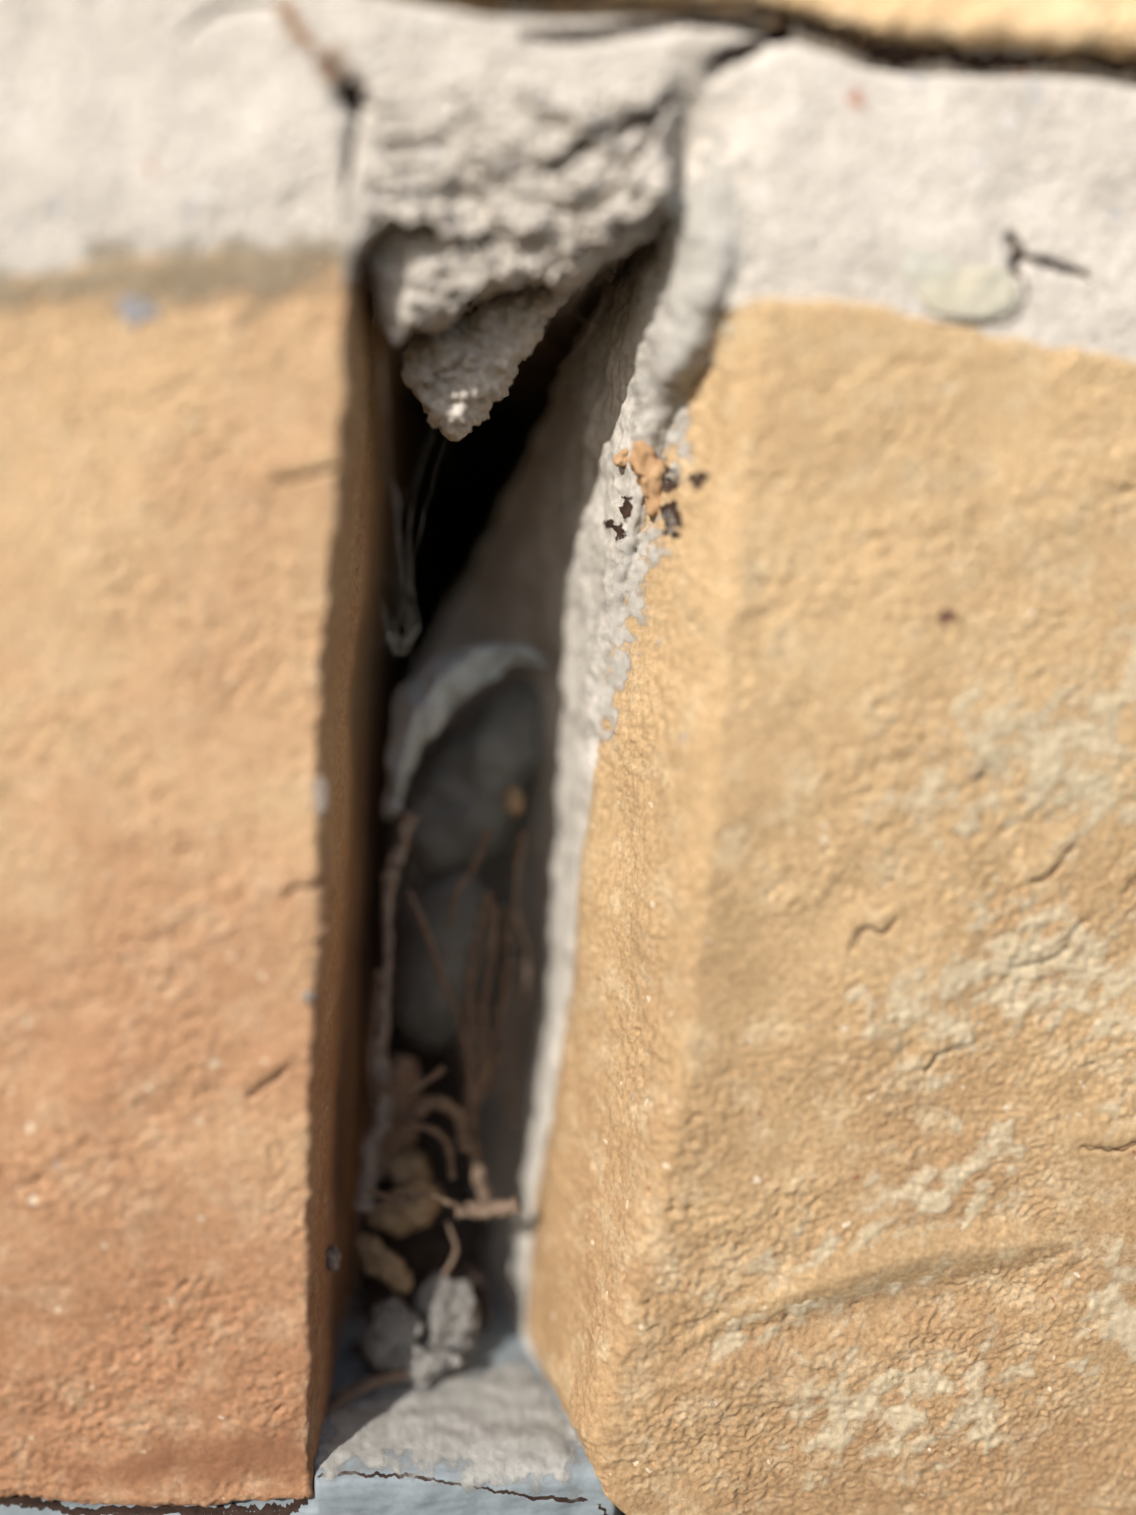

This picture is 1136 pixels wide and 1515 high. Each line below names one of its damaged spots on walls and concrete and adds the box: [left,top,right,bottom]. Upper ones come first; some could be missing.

peeling [443,74,757,741]
crack [928,234,1095,327]